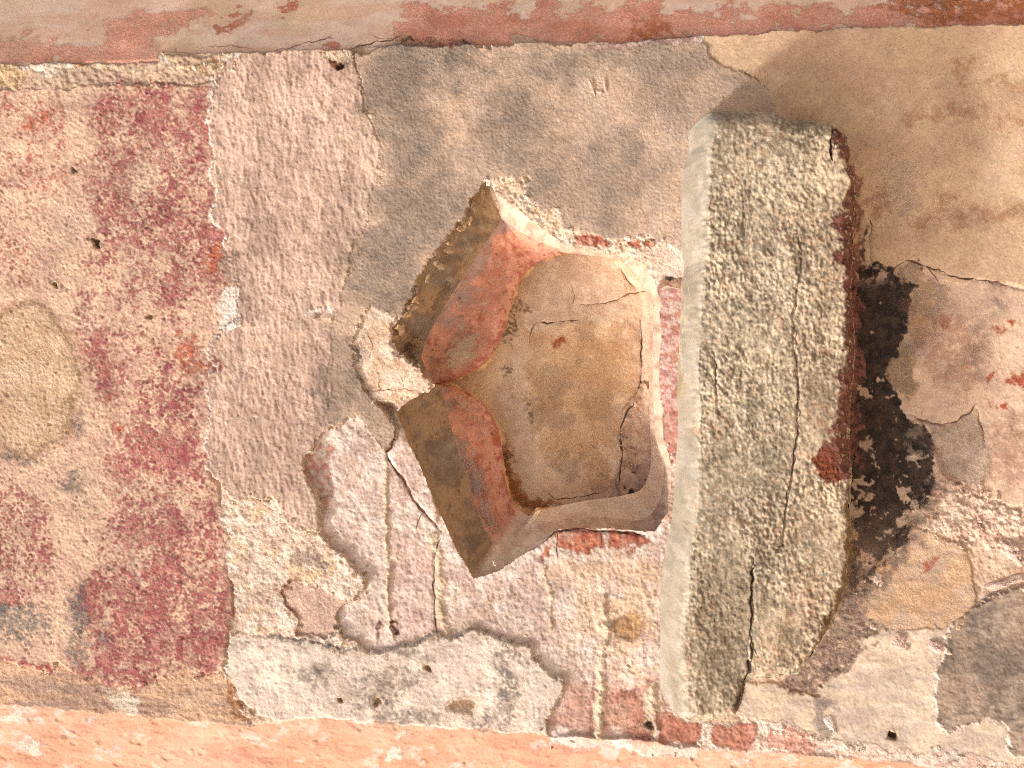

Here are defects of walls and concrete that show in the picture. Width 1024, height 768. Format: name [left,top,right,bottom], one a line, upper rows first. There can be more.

peeling [0,5,242,326]
peeling [75,289,126,402]
crack [375,430,442,632]
spalling [0,325,1024,768]
crack [743,562,757,686]
crack [776,234,802,551]
water stain [778,127,935,740]
spalling [886,263,946,400]